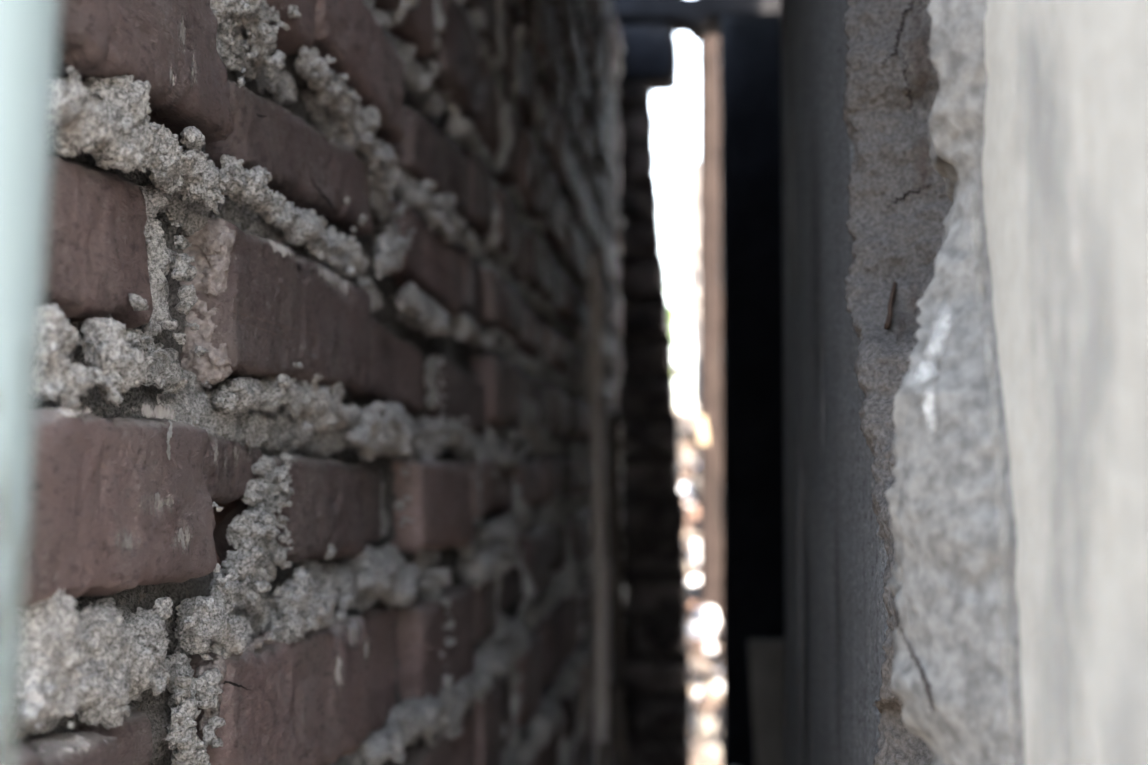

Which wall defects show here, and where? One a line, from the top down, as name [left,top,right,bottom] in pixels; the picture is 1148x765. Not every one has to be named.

crack [881,0,919,127]
crack [887,184,930,208]
spalling [843,0,1025,765]